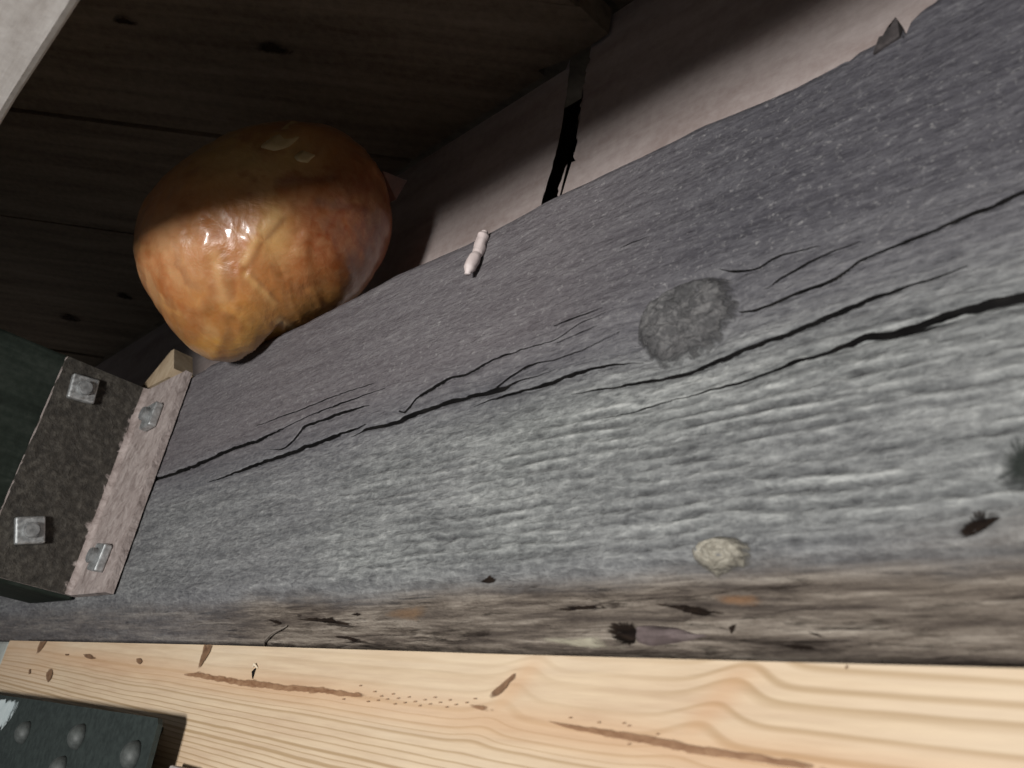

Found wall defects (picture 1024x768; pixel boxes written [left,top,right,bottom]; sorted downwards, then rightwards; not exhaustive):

crack [718,190,1024,313]
crack [155,265,1024,482]